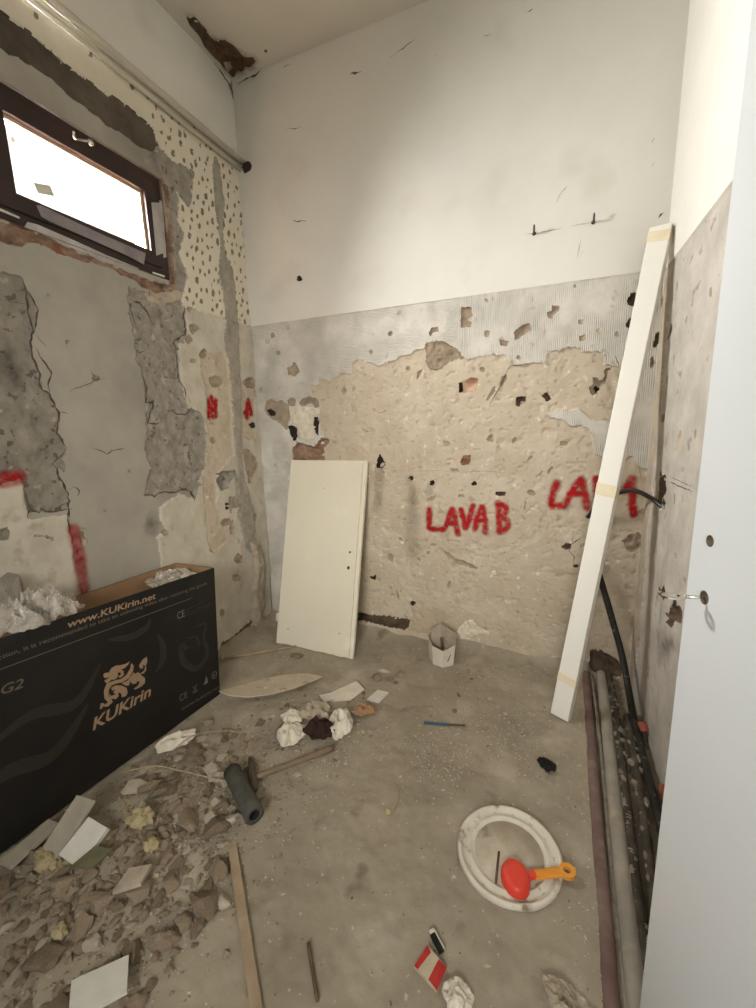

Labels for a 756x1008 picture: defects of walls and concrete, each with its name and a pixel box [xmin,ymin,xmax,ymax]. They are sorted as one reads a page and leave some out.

spalling [187,14,255,98]
crack [15,278,96,544]
spalling [190,319,621,658]
spalling [460,307,473,328]
spalling [584,456,648,677]